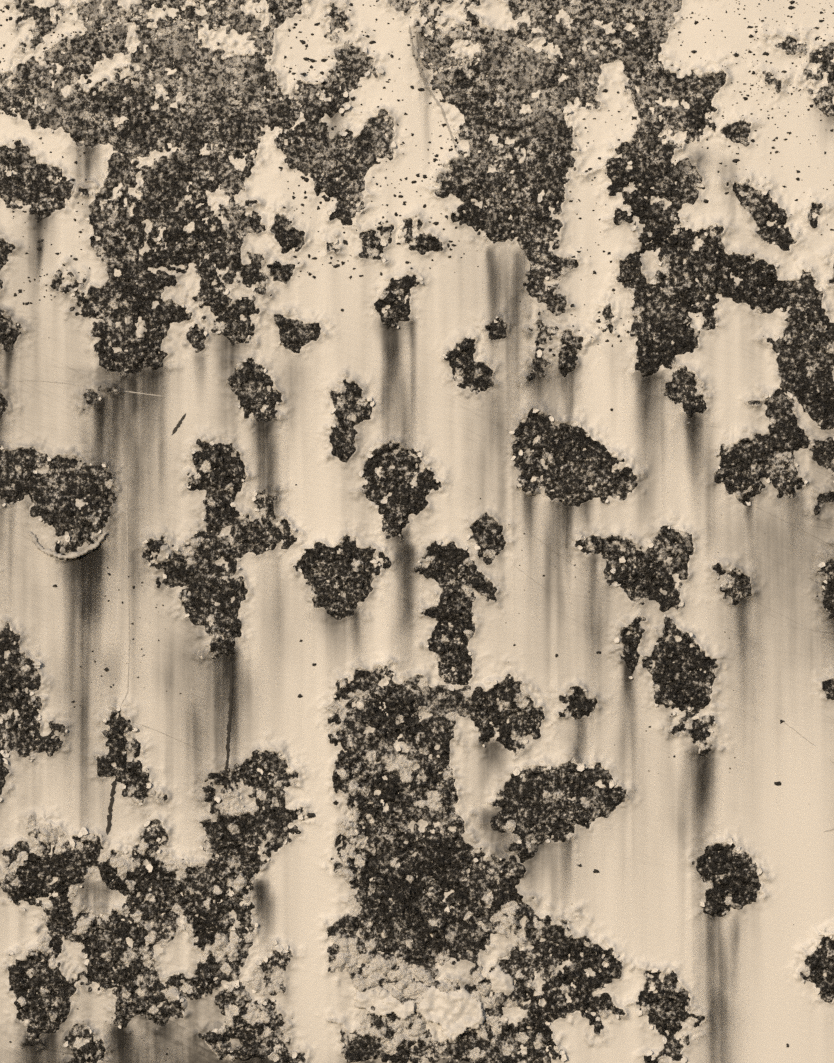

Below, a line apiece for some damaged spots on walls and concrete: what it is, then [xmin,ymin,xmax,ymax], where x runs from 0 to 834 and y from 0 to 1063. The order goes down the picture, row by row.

peeling [486,965,515,996]
peeling [354,986,484,1041]